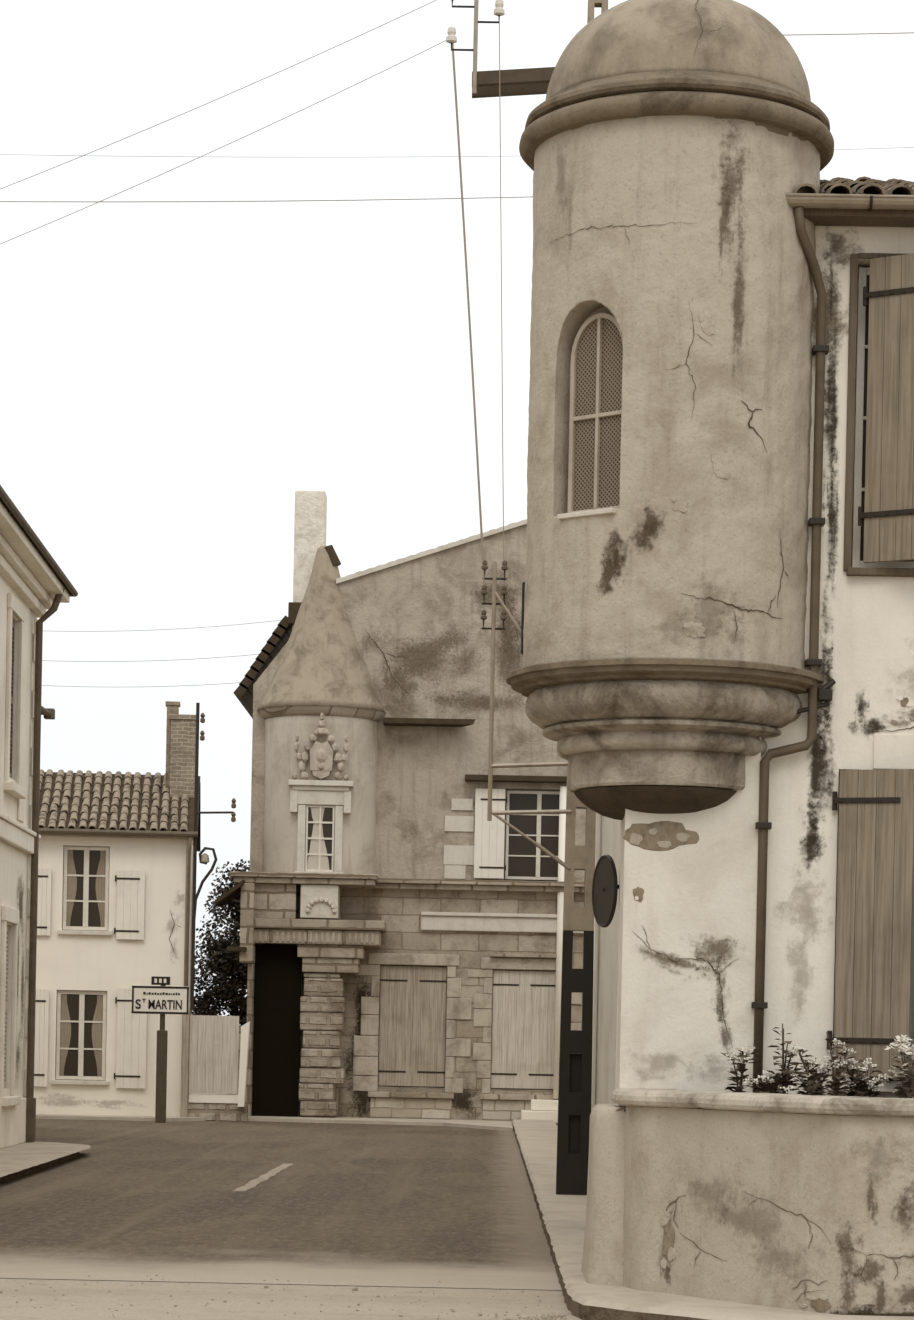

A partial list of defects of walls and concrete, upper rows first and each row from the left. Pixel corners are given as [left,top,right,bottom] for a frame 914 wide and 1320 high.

crack [552,222,696,242]
crack [669,306,707,415]
crack [741,400,767,451]
water stain [812,234,862,630]
water stain [600,507,663,593]
crack [682,538,789,639]
water stain [800,648,834,869]
spalling [623,821,699,851]
crack [666,1195,725,1266]
water stain [829,1287,914,1316]